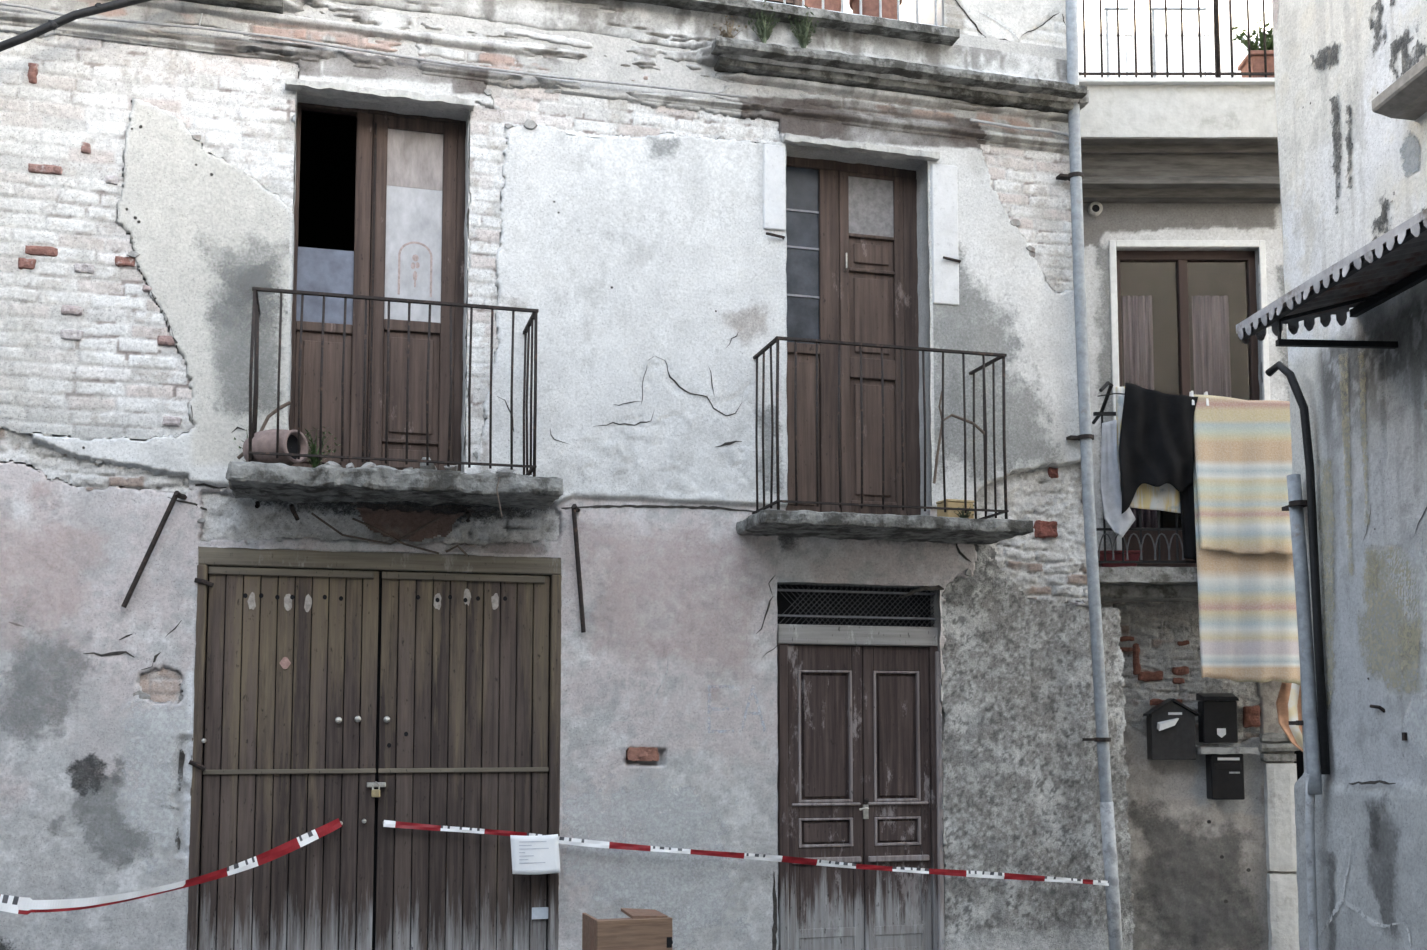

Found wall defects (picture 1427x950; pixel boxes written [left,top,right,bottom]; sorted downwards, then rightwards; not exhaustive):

leakage [1310,43,1339,72]
leakage [1369,0,1427,79]
leakage [1329,96,1353,214]
flaking render [0,31,560,546]
flaking render [466,85,782,462]
flaking render [979,139,1074,293]
leakage [1371,192,1395,239]
crack [550,333,742,447]
flaking render [133,667,183,704]
flaking render [941,462,1261,950]
leakage [66,699,190,872]